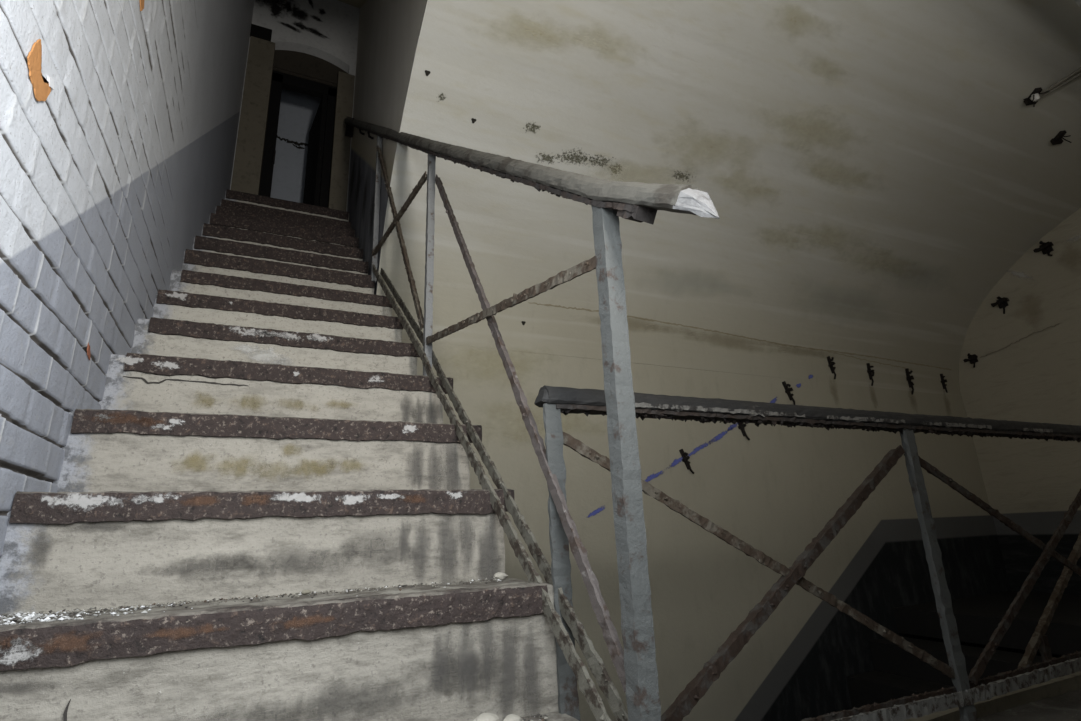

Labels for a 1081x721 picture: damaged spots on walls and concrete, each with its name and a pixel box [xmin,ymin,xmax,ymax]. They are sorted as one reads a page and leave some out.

peeling [256,0,327,38]
peeling [27,39,54,101]
damp [536,149,622,174]
crack [123,376,248,386]
damp [404,403,437,423]
damp [413,451,457,490]
damp [442,525,494,581]
damp [436,634,536,704]